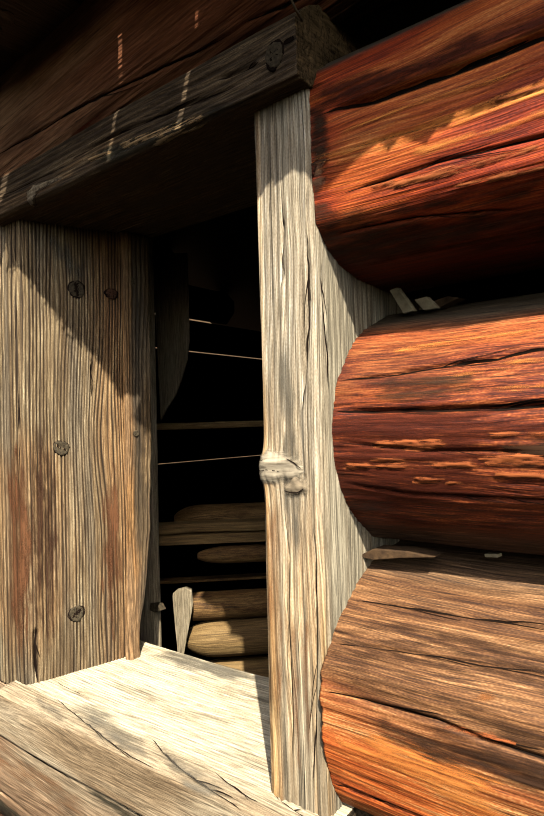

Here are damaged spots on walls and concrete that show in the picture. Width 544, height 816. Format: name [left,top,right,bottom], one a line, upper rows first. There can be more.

crack [0,0,297,154]
crack [324,36,544,114]
crack [5,59,258,195]
crack [279,220,287,285]
crack [302,237,544,409]
crack [339,398,544,415]
crack [283,515,291,603]
crack [311,528,319,616]
crack [356,600,544,630]
crack [57,682,257,809]
crack [287,624,544,784]